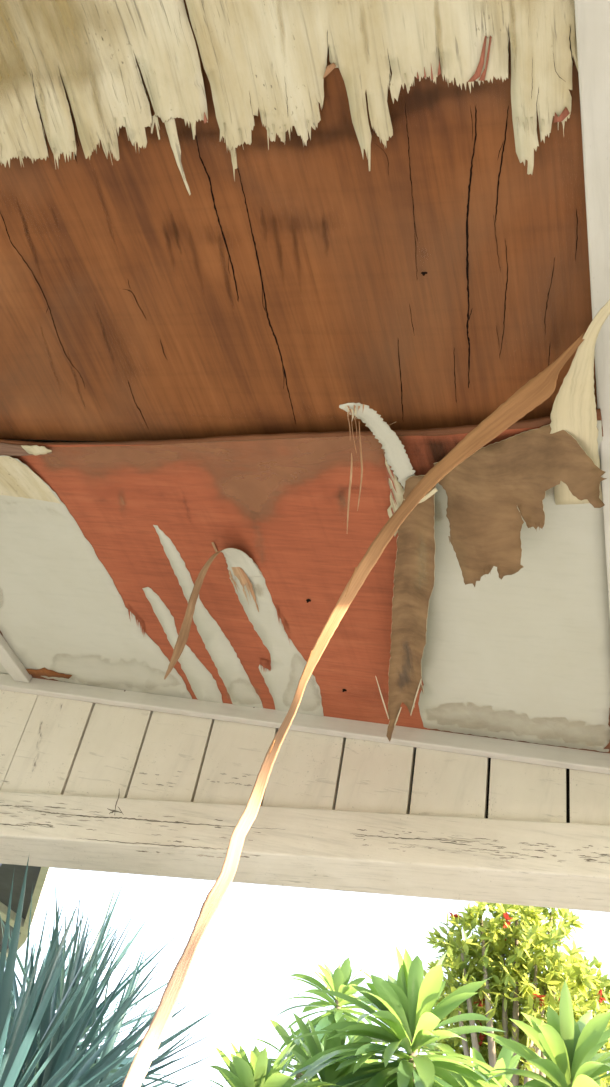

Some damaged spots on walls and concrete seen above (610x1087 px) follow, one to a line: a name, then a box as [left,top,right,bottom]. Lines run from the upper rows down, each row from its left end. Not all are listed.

crack [0,213,85,387]
crack [196,135,296,422]
peeling [0,41,592,730]
crack [377,104,418,275]
crack [398,304,414,419]
crack [454,24,578,402]